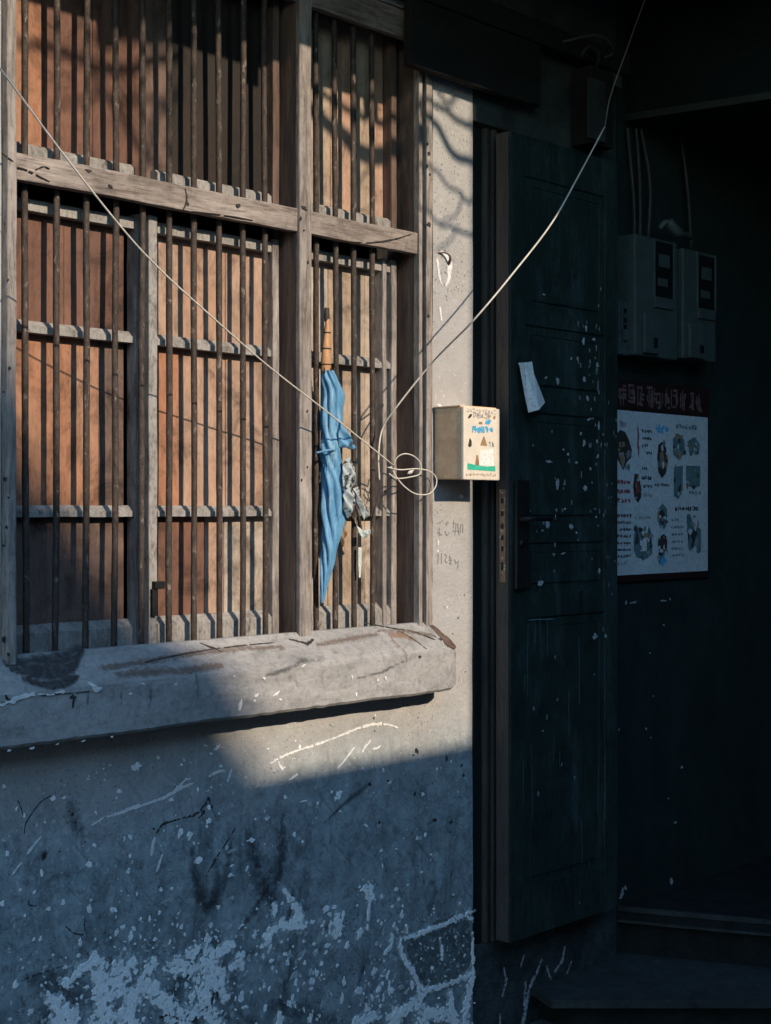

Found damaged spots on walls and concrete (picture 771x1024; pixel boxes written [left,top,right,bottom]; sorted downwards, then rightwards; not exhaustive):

spalling [429,625,456,648]
damp [4,645,84,689]
crack [156,797,236,877]